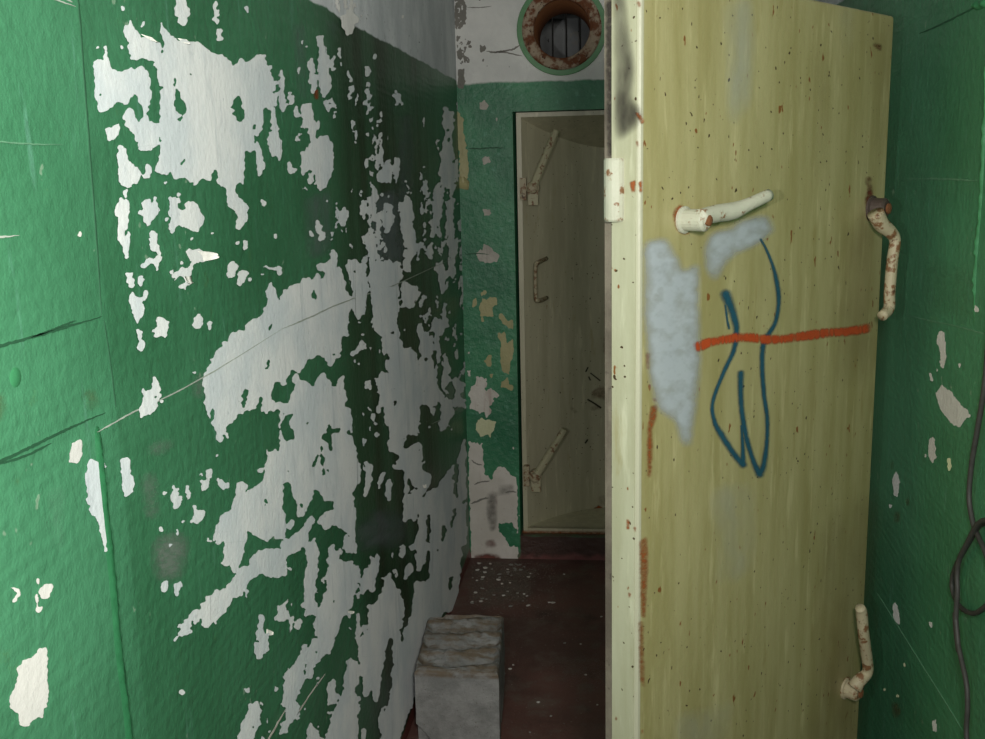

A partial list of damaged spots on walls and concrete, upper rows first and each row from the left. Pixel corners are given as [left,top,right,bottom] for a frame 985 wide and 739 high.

peeling [93,0,520,739]
peeling [929,331,971,427]
peeling [69,440,107,552]
peeling [9,647,49,727]